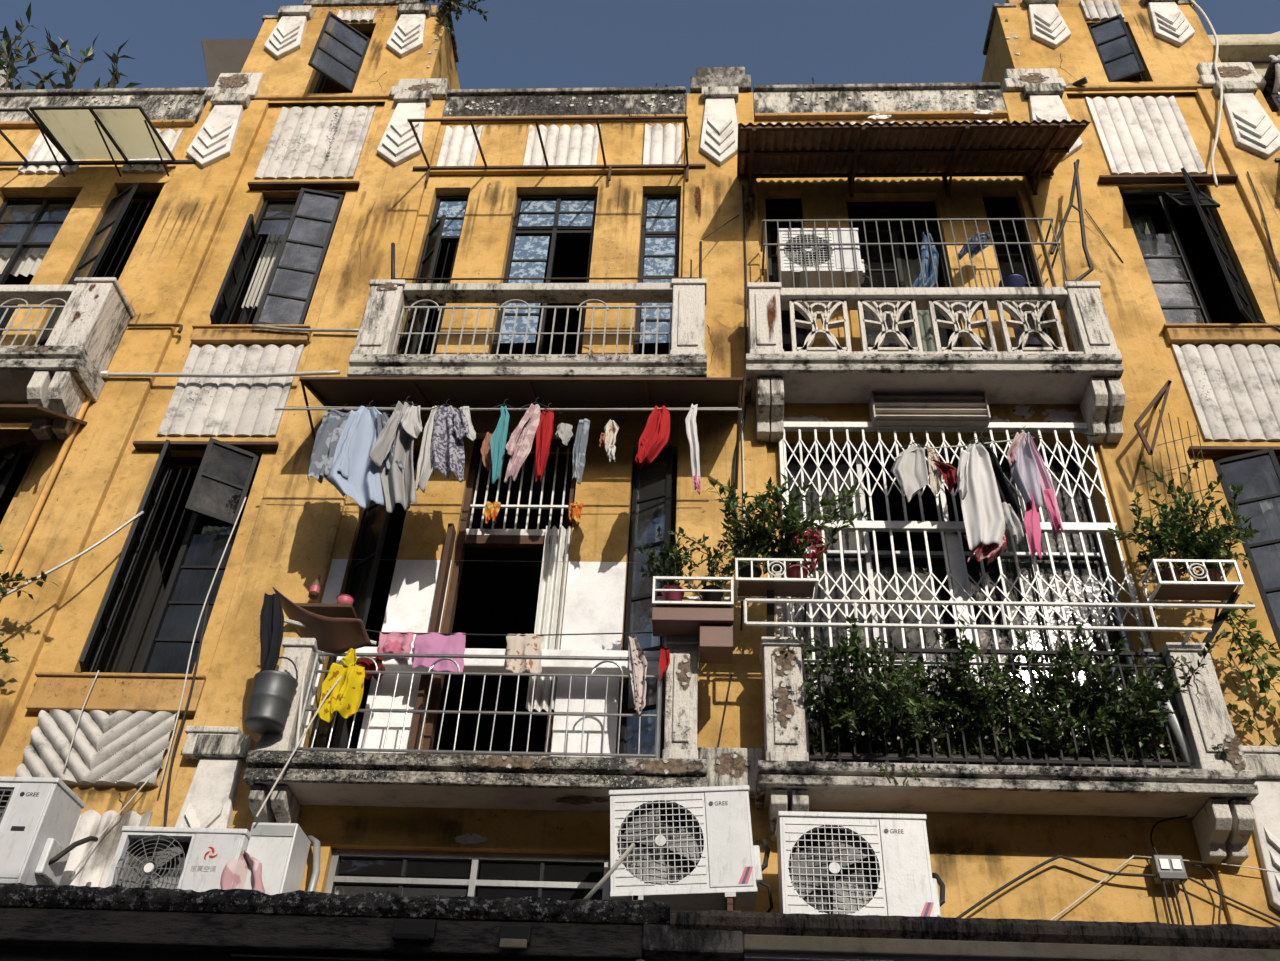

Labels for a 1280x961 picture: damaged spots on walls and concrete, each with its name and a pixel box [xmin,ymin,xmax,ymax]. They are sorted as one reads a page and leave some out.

rust [767,296,777,338]
spalling [676,654,693,690]
spalling [771,645,797,728]